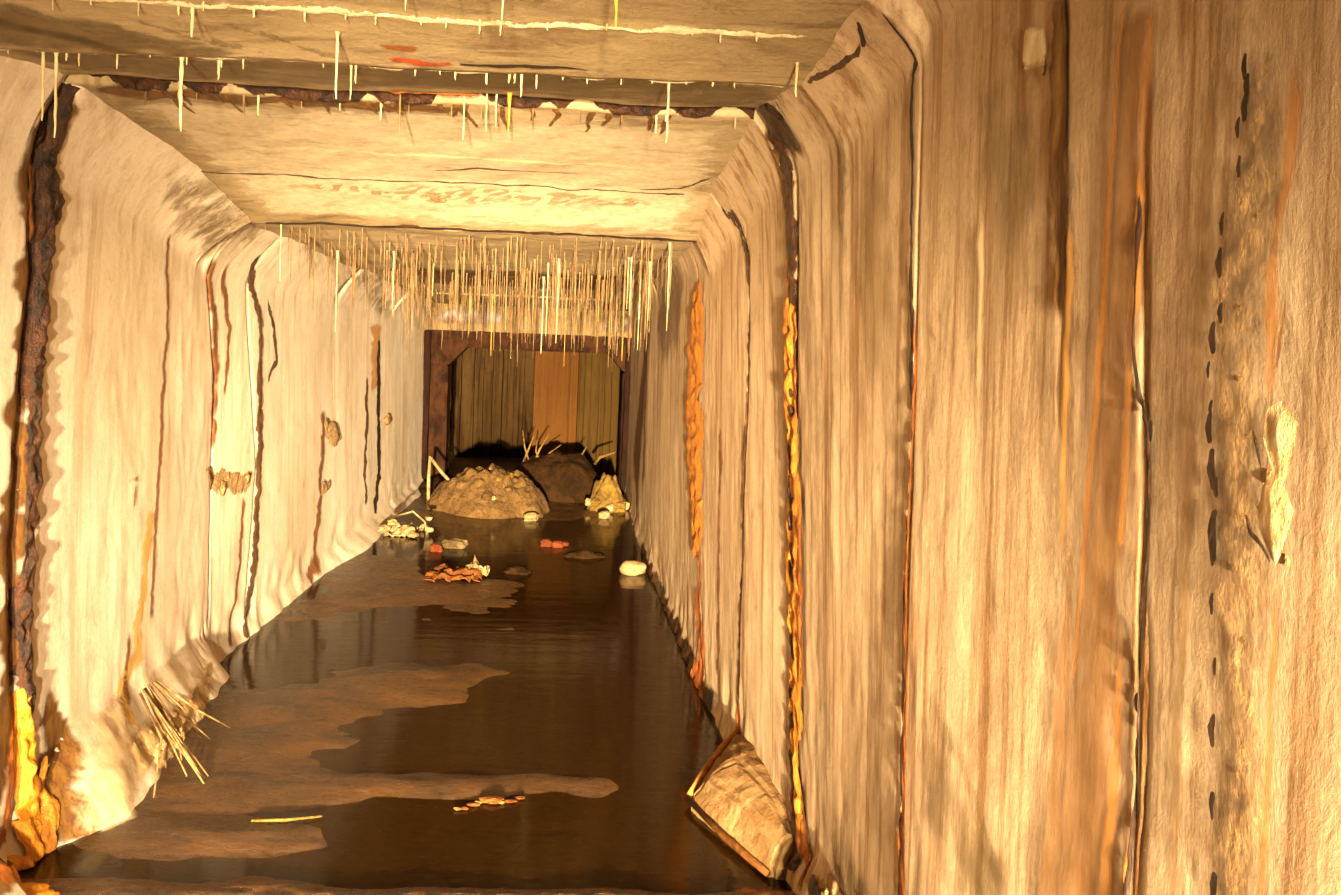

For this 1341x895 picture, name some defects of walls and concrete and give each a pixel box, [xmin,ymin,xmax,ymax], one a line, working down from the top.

water stain [78,0,807,38]
water stain [0,5,791,106]
water stain [409,268,626,292]
water stain [438,306,504,323]
crack [0,74,801,871]
crack [808,15,918,895]
crack [0,858,15,895]
spalling [799,872,841,895]